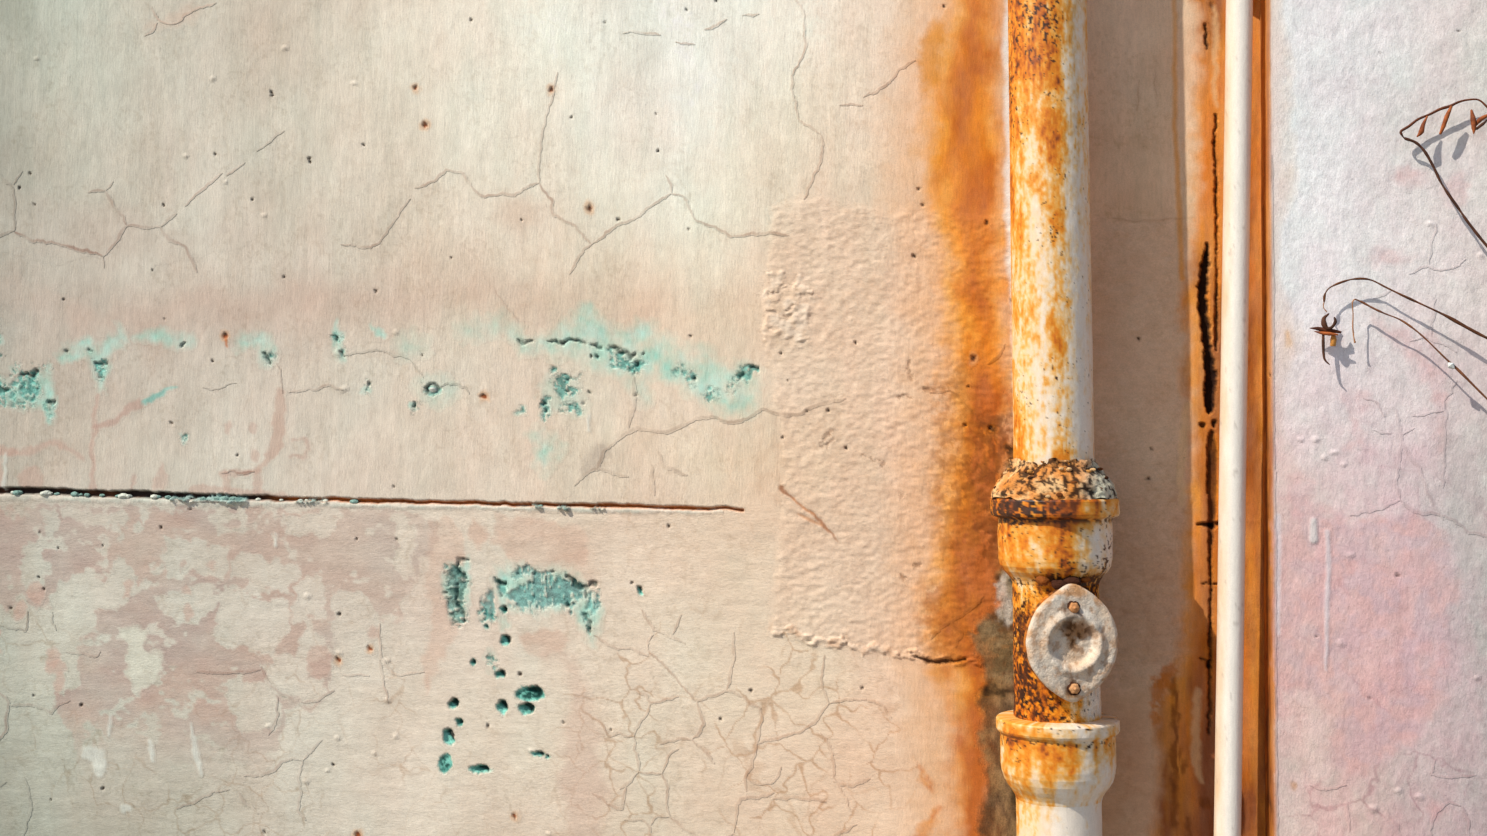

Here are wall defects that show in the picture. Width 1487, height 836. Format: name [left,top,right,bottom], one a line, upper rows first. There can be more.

crack [0,130,284,272]
crack [340,72,789,274]
peeling [0,317,214,431]
crack [0,375,846,516]
peeling [504,299,784,481]
rust [858,0,1013,836]
damp [987,424,1013,479]
peeling [115,620,168,696]
peeling [438,553,607,678]
crack [591,608,892,836]
damp [964,565,1017,836]
rust [1035,576,1091,590]